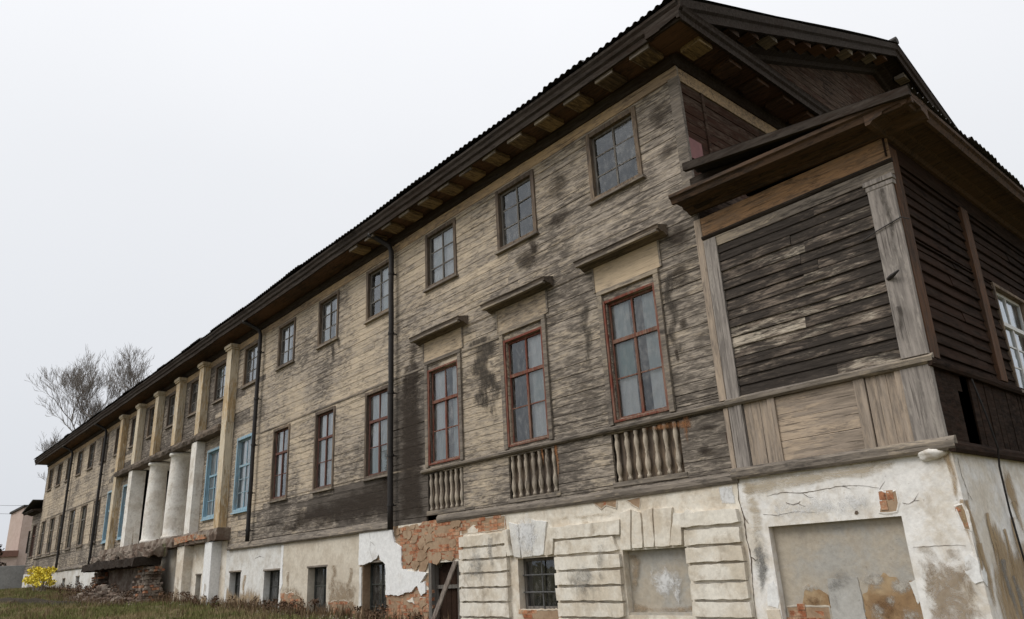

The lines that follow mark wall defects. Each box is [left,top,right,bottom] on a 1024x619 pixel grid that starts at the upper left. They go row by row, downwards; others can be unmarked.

leakage [469,336,499,408]
leakage [268,345,423,531]
flaking render [328,515,506,619]
flaking render [766,581,833,619]
crack [737,483,883,619]
flaking render [878,490,901,515]
spalling [863,573,924,619]
flaking render [953,503,973,532]
leakage [986,473,1024,619]